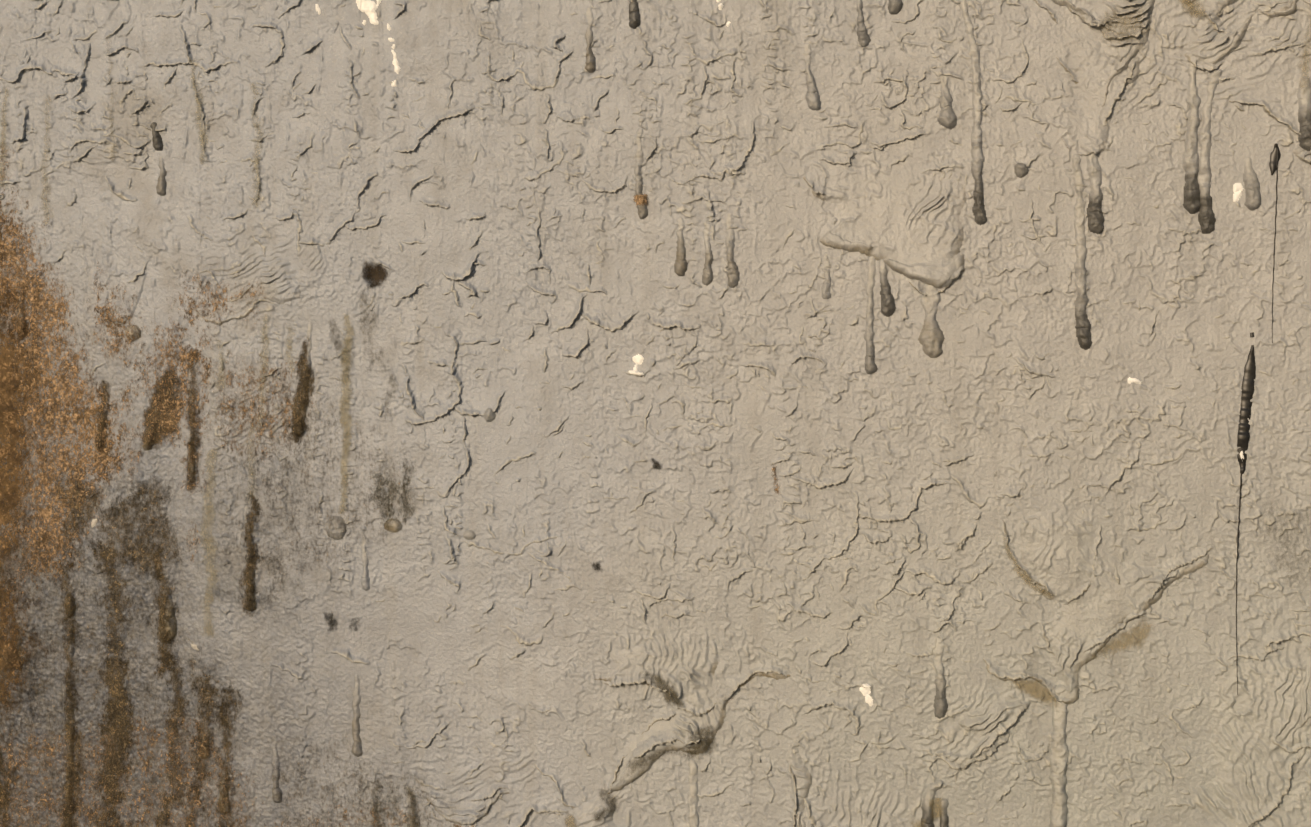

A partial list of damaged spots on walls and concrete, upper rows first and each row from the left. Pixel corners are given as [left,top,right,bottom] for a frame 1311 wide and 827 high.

crack [817,0,1085,256]
crack [1104,31,1178,230]
crack [1219,16,1309,160]
crack [1103,227,1262,342]
corrosion [0,146,314,827]
crack [0,0,1031,764]
crack [996,350,1223,585]
crack [502,763,577,827]
crack [697,756,772,827]
crack [967,740,1046,823]
crack [1134,613,1311,788]